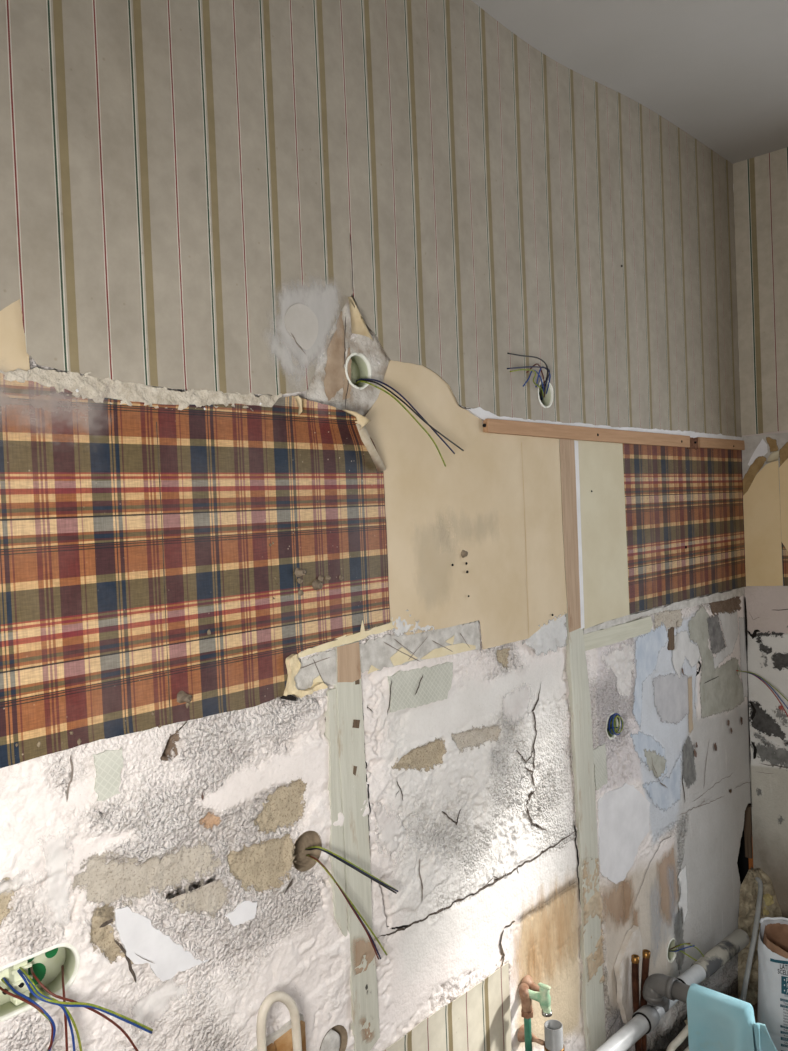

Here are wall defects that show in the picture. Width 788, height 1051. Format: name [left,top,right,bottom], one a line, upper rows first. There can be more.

flaking render [707,596,788,671]
flaking render [630,609,683,780]
flaking render [160,730,181,761]
crack [362,675,423,844]
flaking render [391,725,501,772]
flaking render [682,736,696,789]
peeling [749,700,788,771]
crack [378,684,581,938]
flaking render [597,783,650,884]
flaking render [0,877,20,925]
flaking render [70,777,307,982]
flaking render [674,910,685,976]